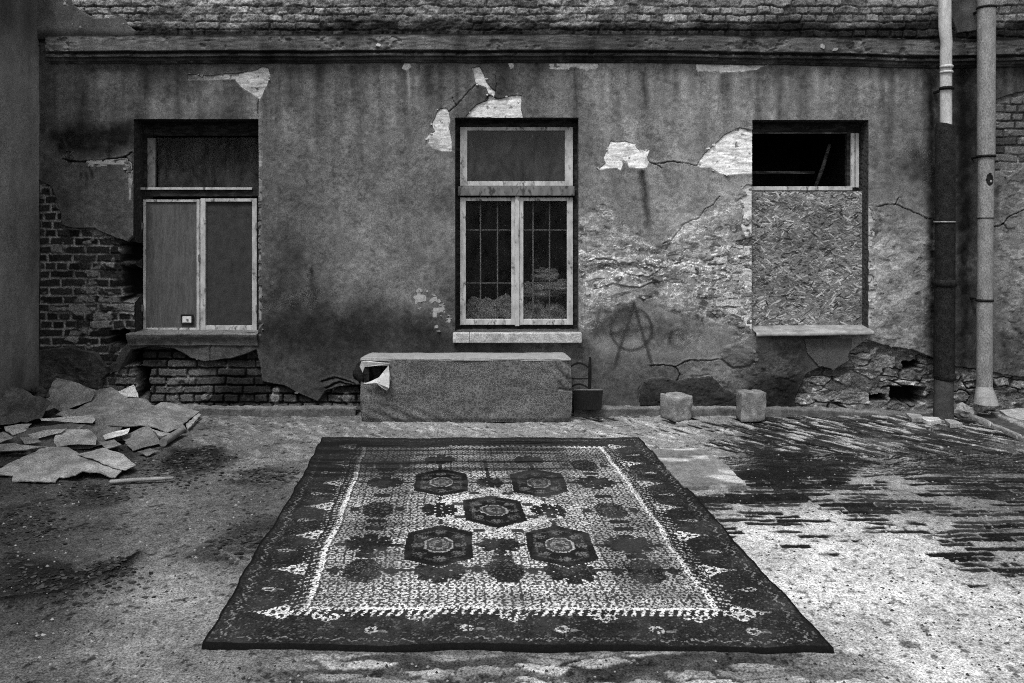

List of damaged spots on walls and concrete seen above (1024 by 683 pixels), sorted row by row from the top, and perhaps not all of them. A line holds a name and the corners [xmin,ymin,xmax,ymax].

flaking render [188,67,270,101]
flaking render [467,67,524,118]
flaking render [425,108,452,151]
flaking render [995,92,1024,177]
flaking render [578,128,754,344]
flaking render [39,181,361,412]
flaking render [795,340,934,411]
flaking render [954,367,1024,413]